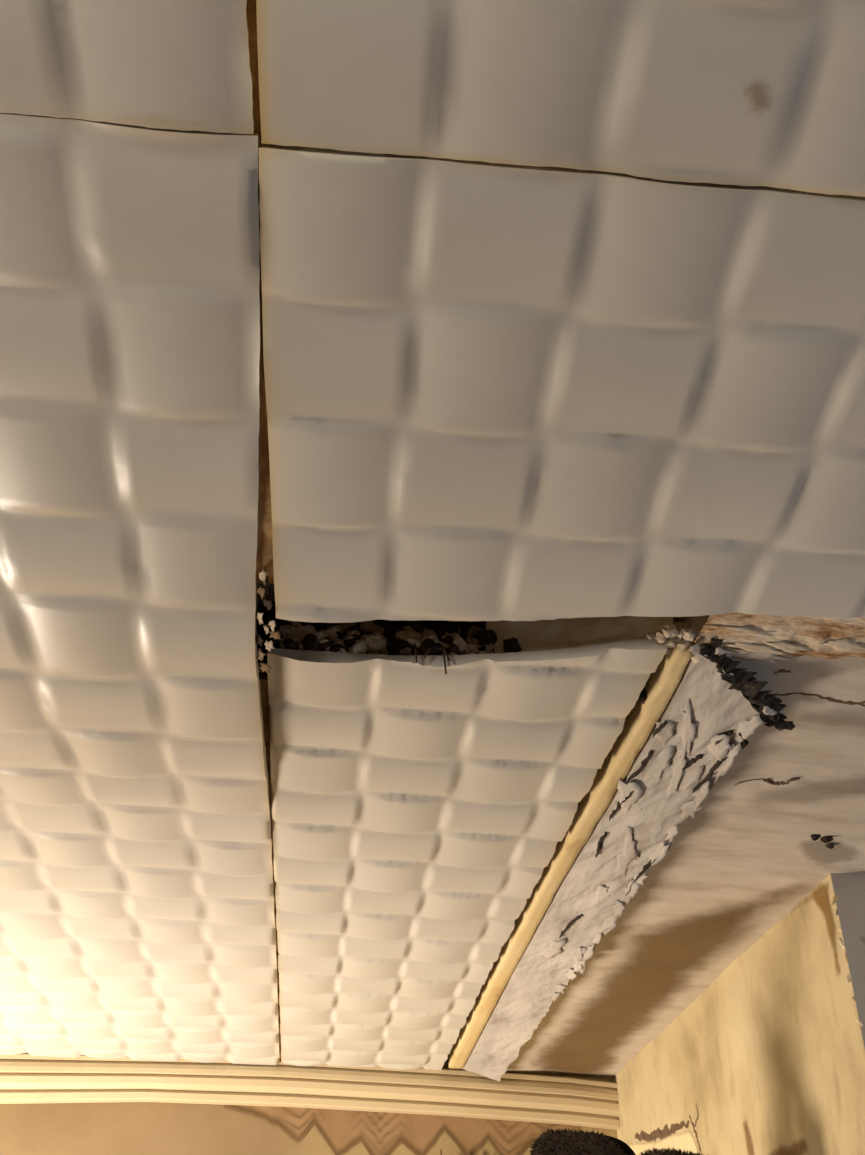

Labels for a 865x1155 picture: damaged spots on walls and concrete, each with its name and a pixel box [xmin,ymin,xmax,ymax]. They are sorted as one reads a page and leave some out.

spalling [255,569,327,680]
spalling [356,619,486,655]
crack [774,669,865,707]
crack [735,777,800,785]
peeling [541,613,865,1002]